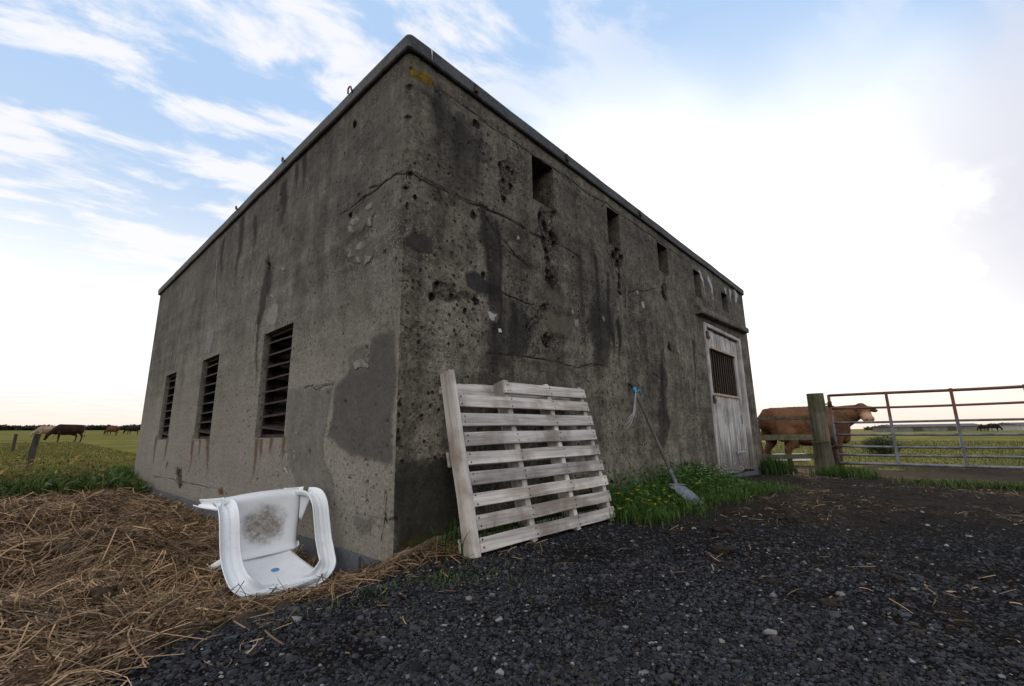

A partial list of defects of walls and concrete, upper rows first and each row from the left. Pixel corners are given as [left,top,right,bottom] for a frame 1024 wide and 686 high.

peeling [346,202,375,265]
crack [342,171,578,266]
spalling [498,157,516,203]
spalling [537,209,558,290]
crack [417,78,687,262]
crack [487,353,606,377]